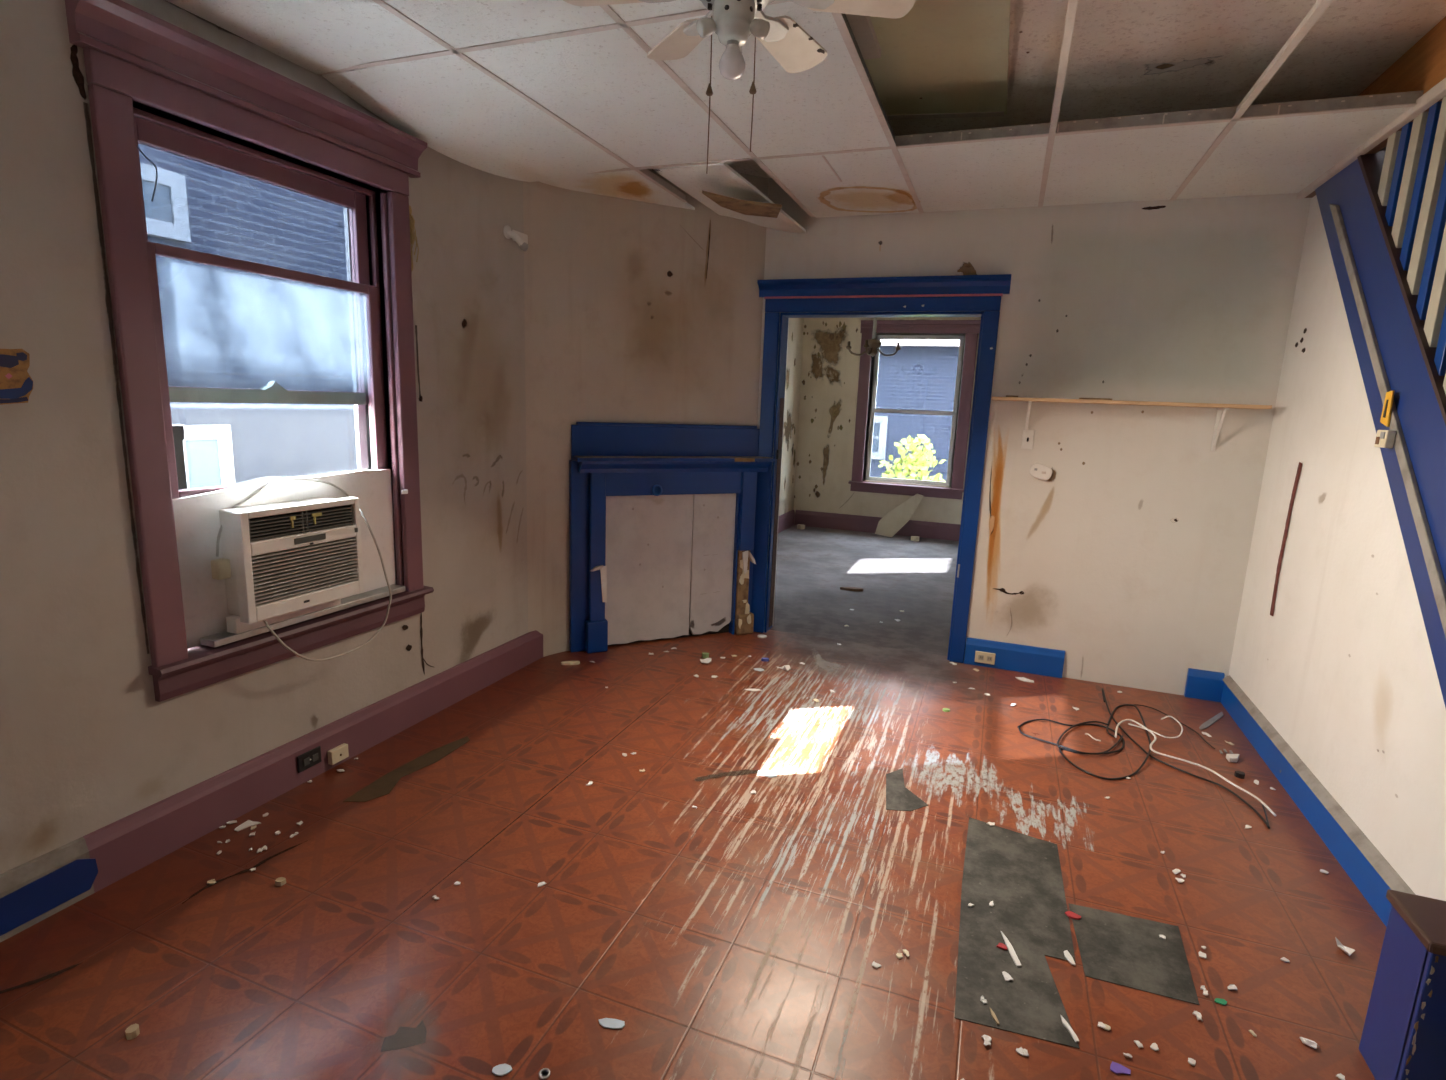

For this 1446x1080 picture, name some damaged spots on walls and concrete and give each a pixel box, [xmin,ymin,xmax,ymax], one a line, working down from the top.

peeling [886,769,928,811]
peeling [954,817,1200,1049]